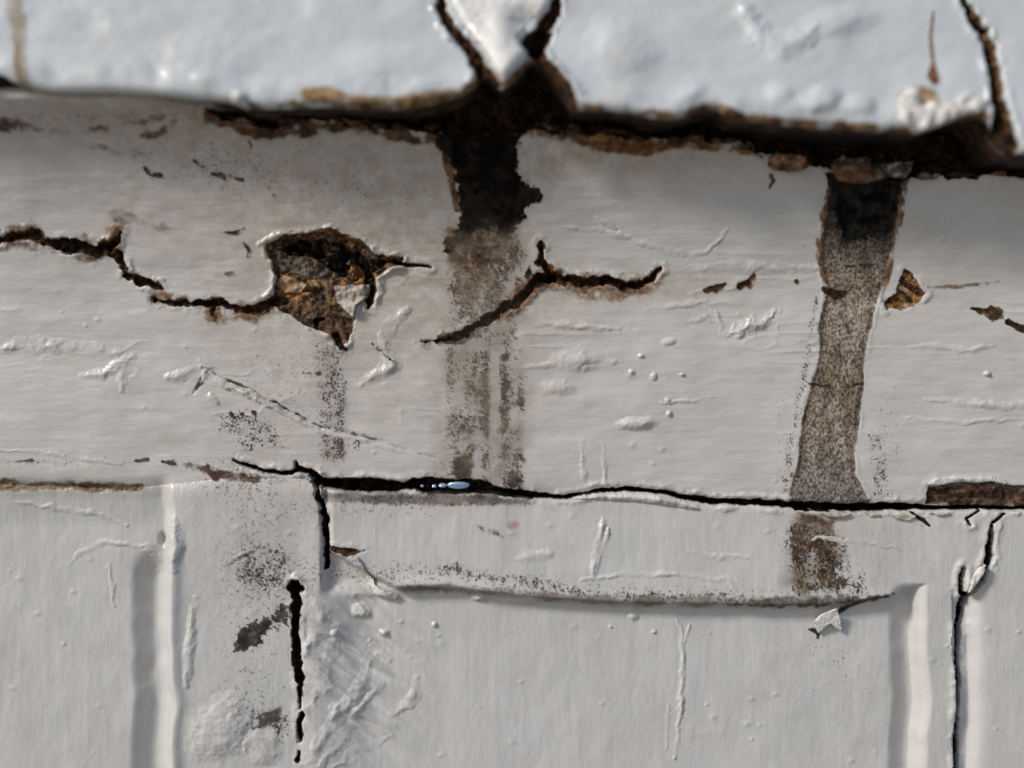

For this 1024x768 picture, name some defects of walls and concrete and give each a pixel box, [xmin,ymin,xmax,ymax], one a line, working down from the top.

crack [960,0,1019,156]
crack [0,221,289,324]
peeling [266,227,432,351]
damp [321,132,543,507]
crack [421,240,662,343]
peeling [884,269,925,311]
damp [401,171,910,613]
crack [286,580,306,763]
crack [234,459,1024,687]
peeling [814,608,842,633]
peeling [864,510,916,520]
peeling [926,477,1024,516]